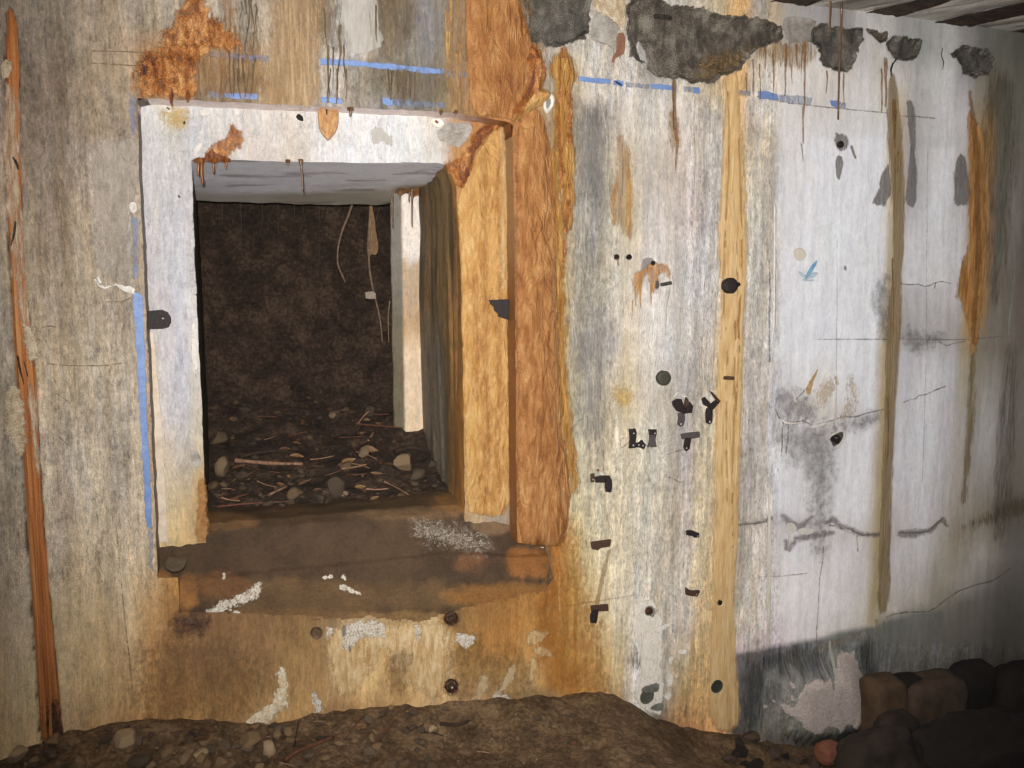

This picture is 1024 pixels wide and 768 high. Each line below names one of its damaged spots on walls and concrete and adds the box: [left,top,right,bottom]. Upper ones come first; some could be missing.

corrosion [131,0,263,104]
spalling [524,0,923,84]
spalling [951,45,995,79]
corrosion [193,124,243,163]
corrosion [445,0,606,692]
corrosion [631,263,671,320]
corrosion [956,91,987,502]
damp [709,72,829,731]
crack [738,515,946,642]